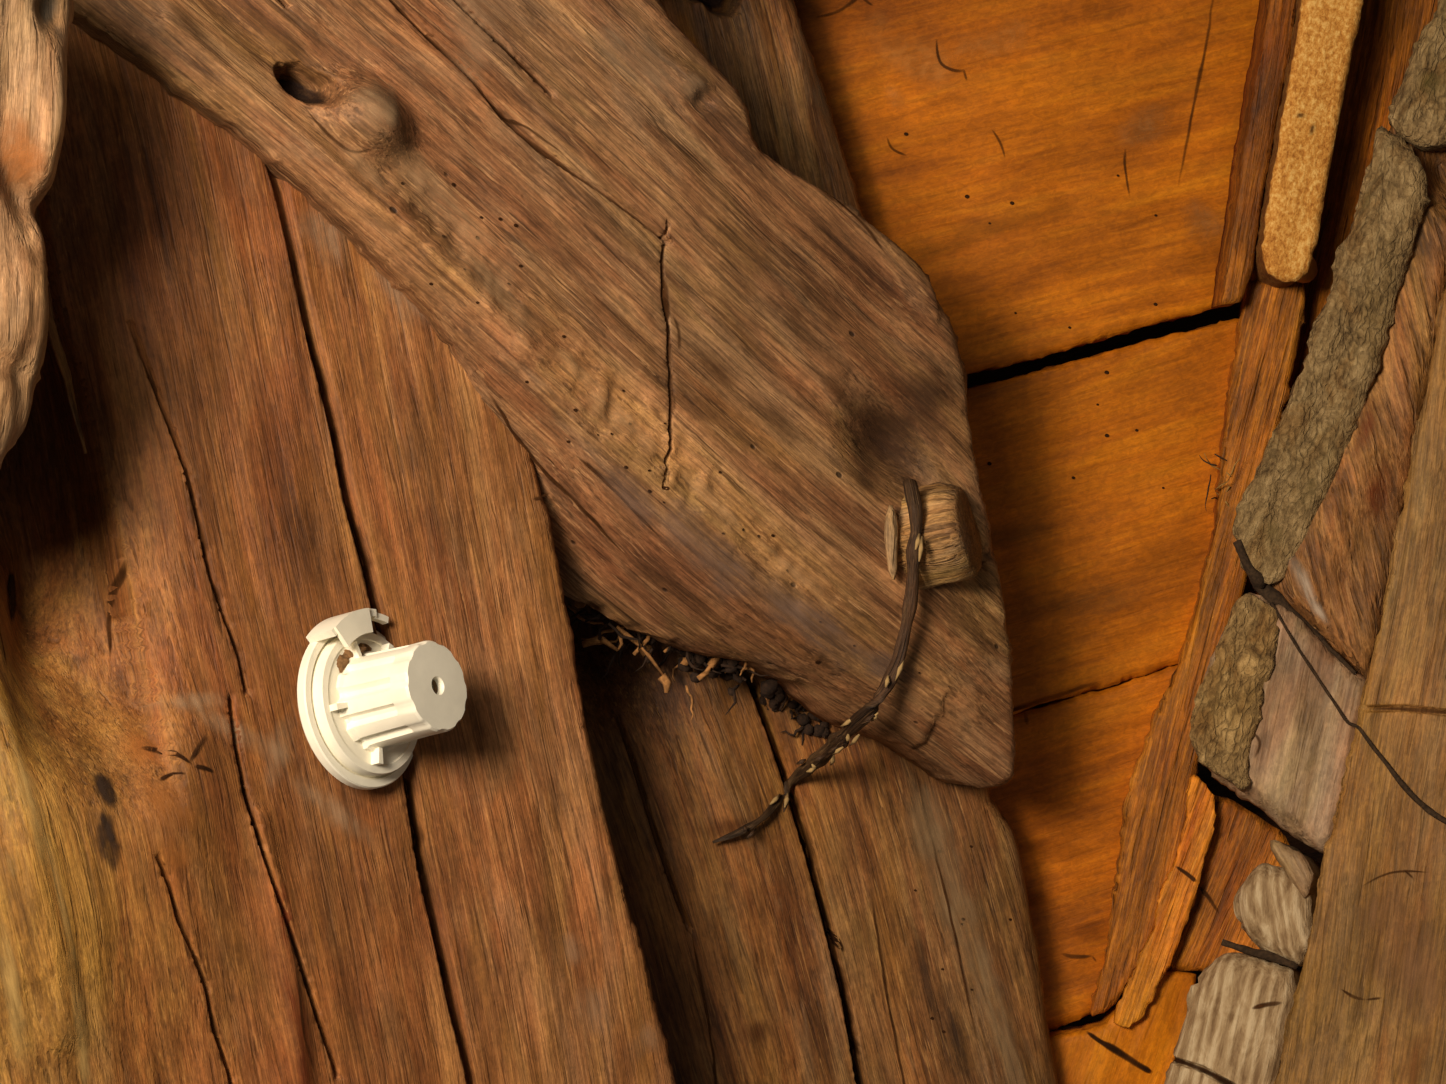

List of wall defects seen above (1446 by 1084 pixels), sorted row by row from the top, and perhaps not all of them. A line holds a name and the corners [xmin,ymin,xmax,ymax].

crack [145,368,158,398]
crack [179,459,232,641]
crack [288,253,378,631]
crack [660,245,680,466]
crack [165,881,230,1081]
crack [144,737,320,1044]
crack [402,774,459,1048]
crack [747,684,858,1084]
crack [873,907,905,1084]